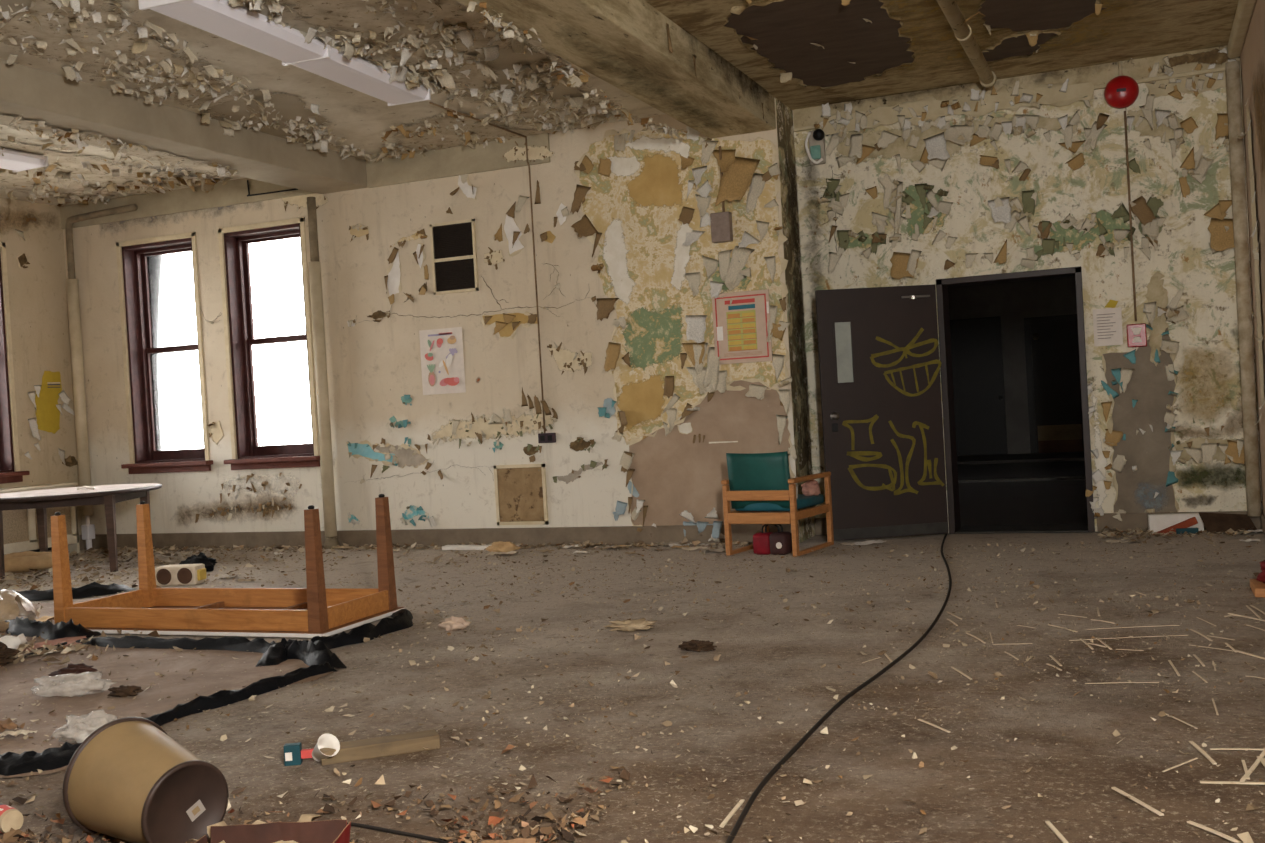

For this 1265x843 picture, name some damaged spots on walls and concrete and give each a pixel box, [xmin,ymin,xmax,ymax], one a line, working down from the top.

peeling [0,0,797,542]
peeling [723,0,1265,522]
water stain [1177,466,1246,505]
water stain [1176,352,1259,448]